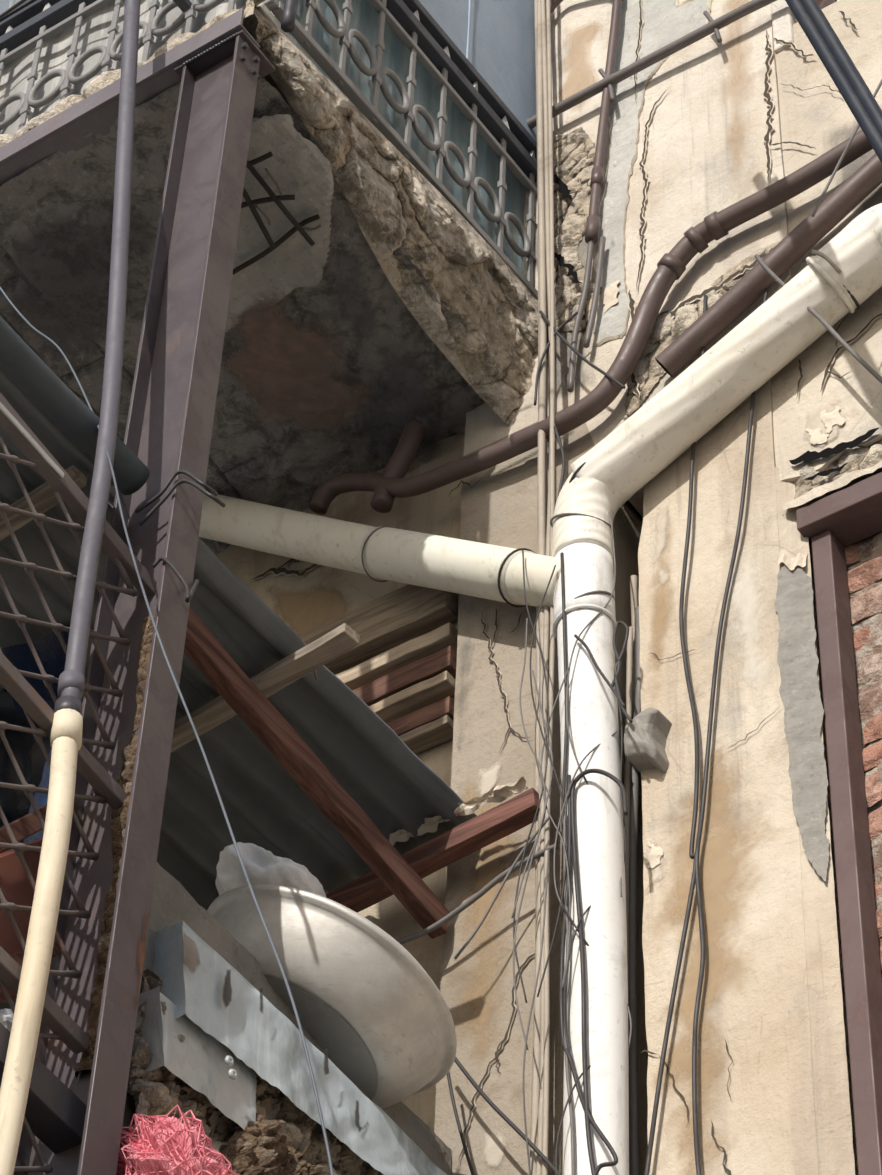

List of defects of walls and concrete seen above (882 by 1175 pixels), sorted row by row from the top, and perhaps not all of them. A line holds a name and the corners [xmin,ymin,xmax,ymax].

spalling [233,151,321,275]